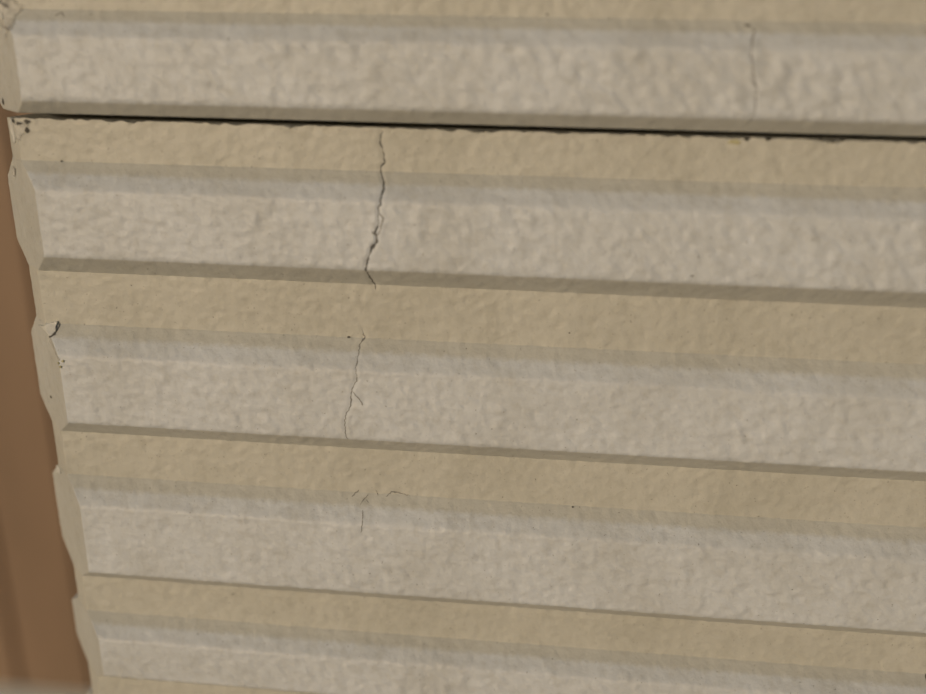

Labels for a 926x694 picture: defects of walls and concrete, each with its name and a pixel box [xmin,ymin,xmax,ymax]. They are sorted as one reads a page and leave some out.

crack [365,131,385,289]
crack [344,331,365,439]
crack [352,490,406,532]